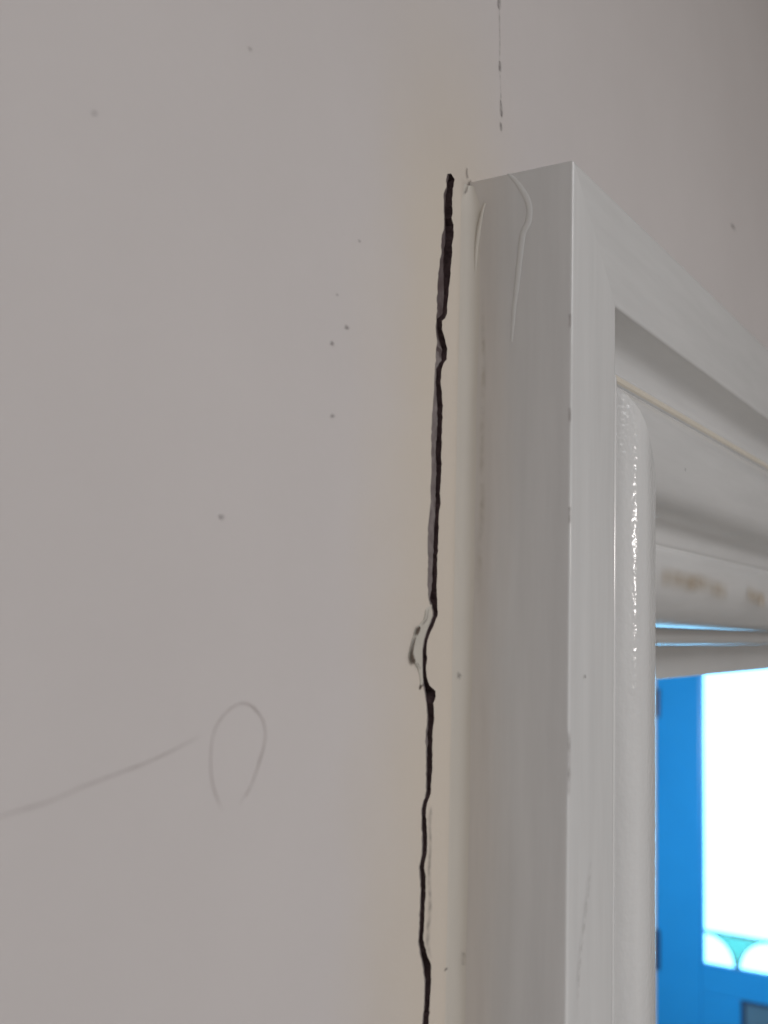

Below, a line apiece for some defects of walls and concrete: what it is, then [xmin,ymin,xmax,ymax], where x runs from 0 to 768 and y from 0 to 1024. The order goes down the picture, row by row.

crack [418,174,470,1024]